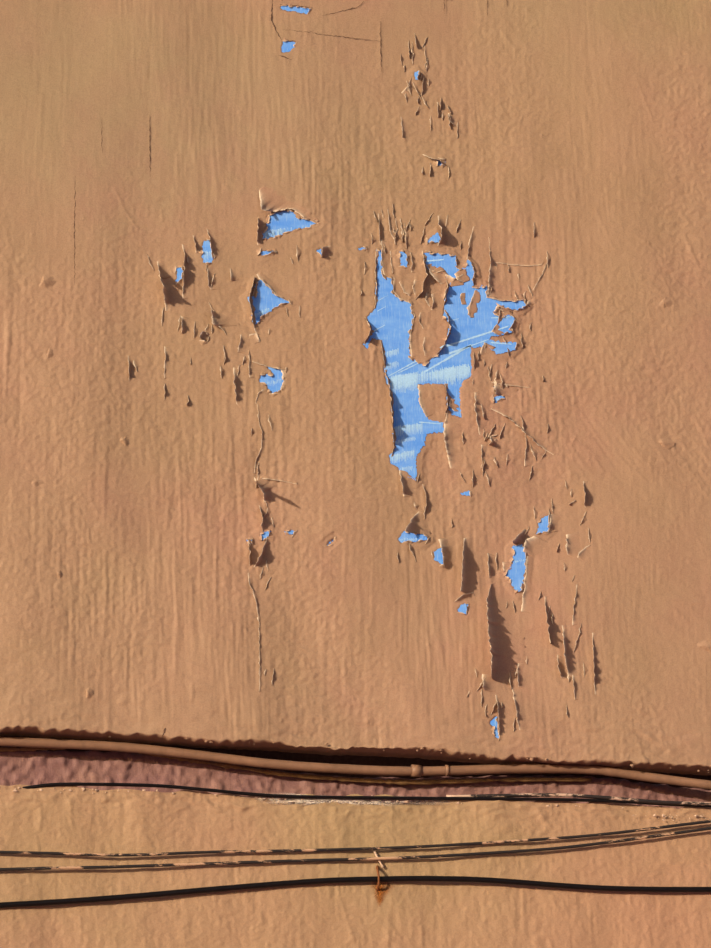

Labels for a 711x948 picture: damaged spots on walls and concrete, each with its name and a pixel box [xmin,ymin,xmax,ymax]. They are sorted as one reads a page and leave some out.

peeling [280,3,312,15]
peeling [281,37,297,53]
peeling [400,33,460,143]
peeling [422,153,450,177]
peeling [256,187,321,258]
peeling [316,245,336,258]
peeling [147,229,302,691]
peeling [358,204,600,742]